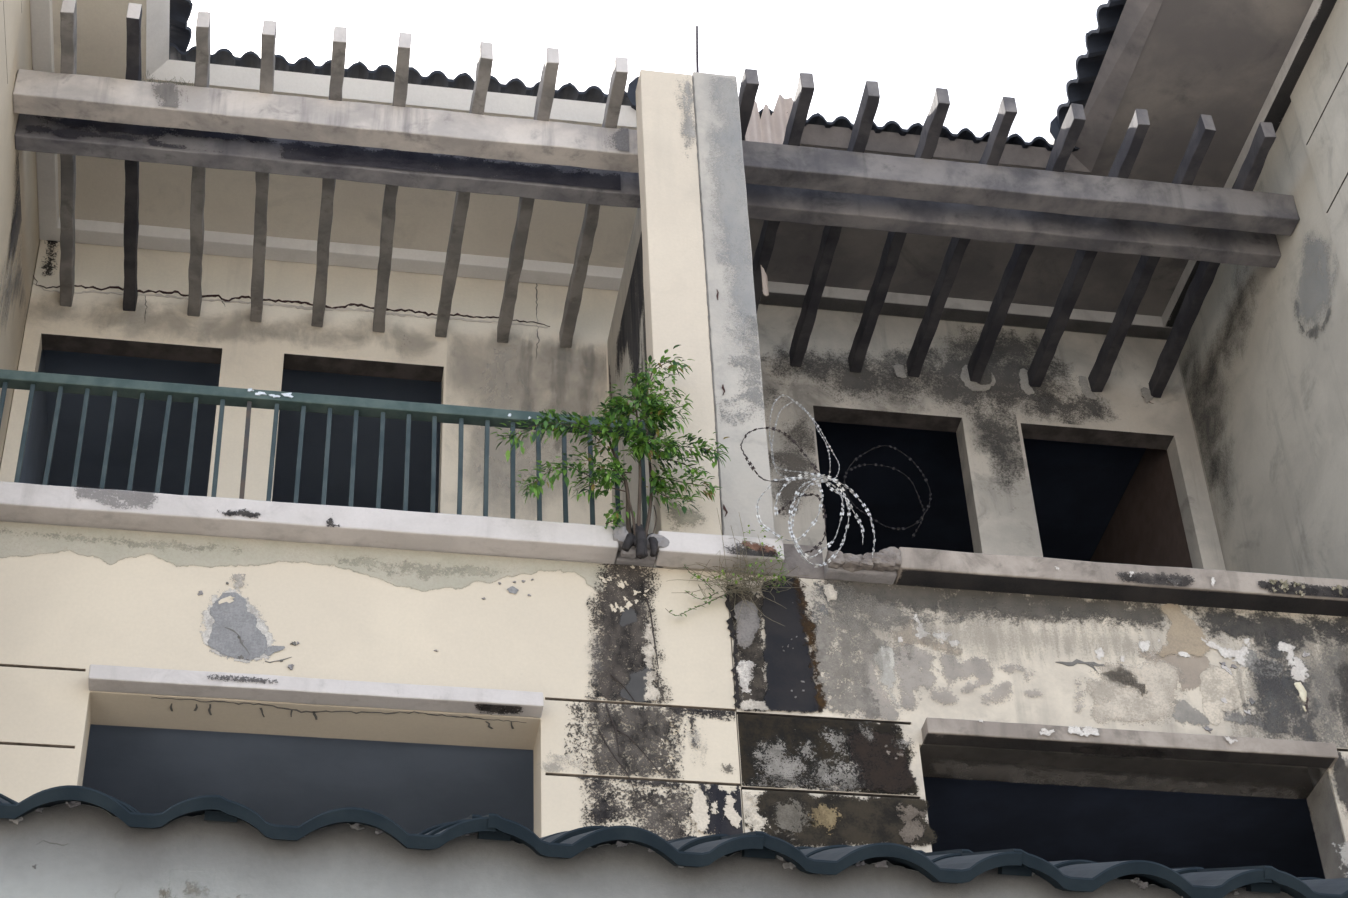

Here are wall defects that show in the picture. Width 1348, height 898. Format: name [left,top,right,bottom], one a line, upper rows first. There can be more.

damp [1264,0,1337,133]
crack [32,275,550,357]
damp [676,78,1115,489]
damp [1126,261,1200,340]
damp [217,508,261,519]
damp [768,421,817,517]
peeling [198,574,299,684]
crack [154,697,526,729]
damp [0,521,1348,898]
peeling [898,613,961,647]
peeling [1039,603,1255,744]
peeling [1278,640,1310,714]